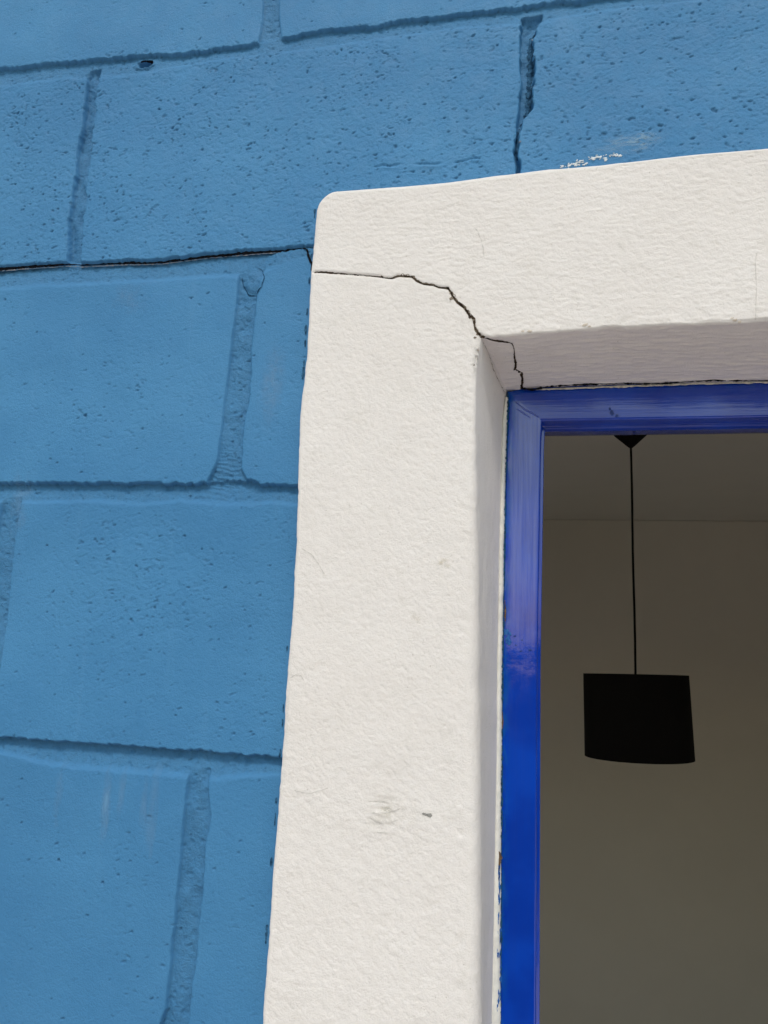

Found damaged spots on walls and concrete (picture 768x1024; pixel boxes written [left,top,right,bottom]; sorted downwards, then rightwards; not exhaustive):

crack [515,32,536,161]
crack [0,248,768,1024]